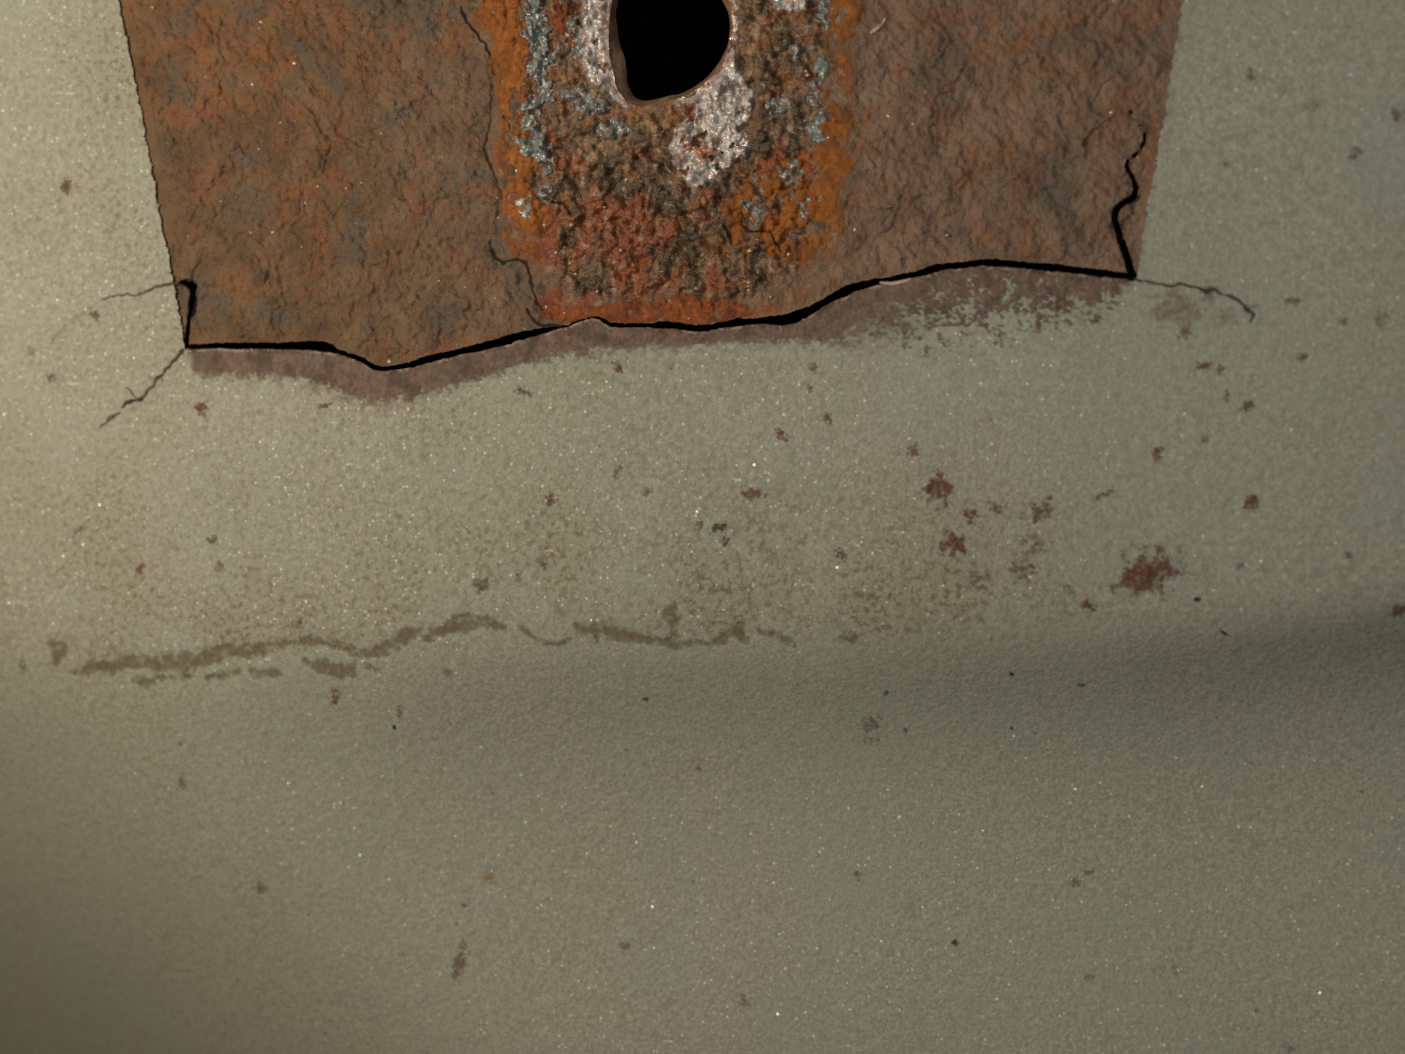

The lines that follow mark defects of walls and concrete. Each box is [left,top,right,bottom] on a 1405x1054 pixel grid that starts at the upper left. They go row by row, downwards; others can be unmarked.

rust [118,0,1183,408]
crack [100,103,1255,426]
rust [925,473,952,510]
rust [1019,495,1051,523]
rust [939,510,978,556]
rust [1111,546,1181,593]